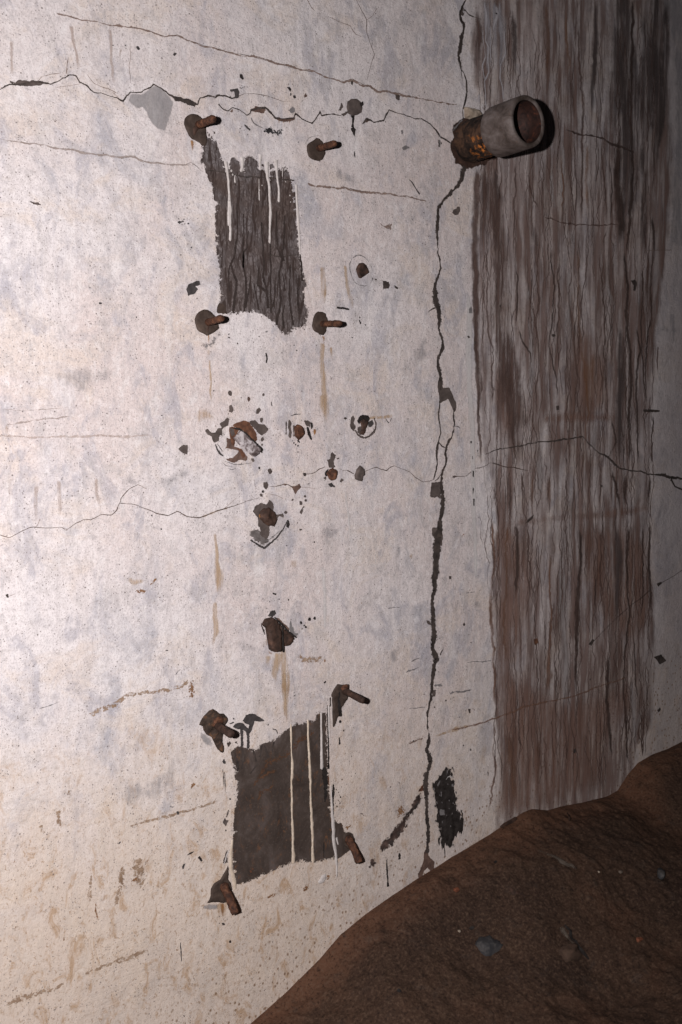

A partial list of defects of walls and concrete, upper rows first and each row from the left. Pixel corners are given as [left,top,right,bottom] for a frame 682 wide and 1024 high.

crack [0,27,452,145]
crack [308,0,376,85]
crack [457,0,481,119]
peeling [201,131,309,351]
leakage [472,0,669,821]
crack [1,165,682,878]
peeling [222,692,356,890]